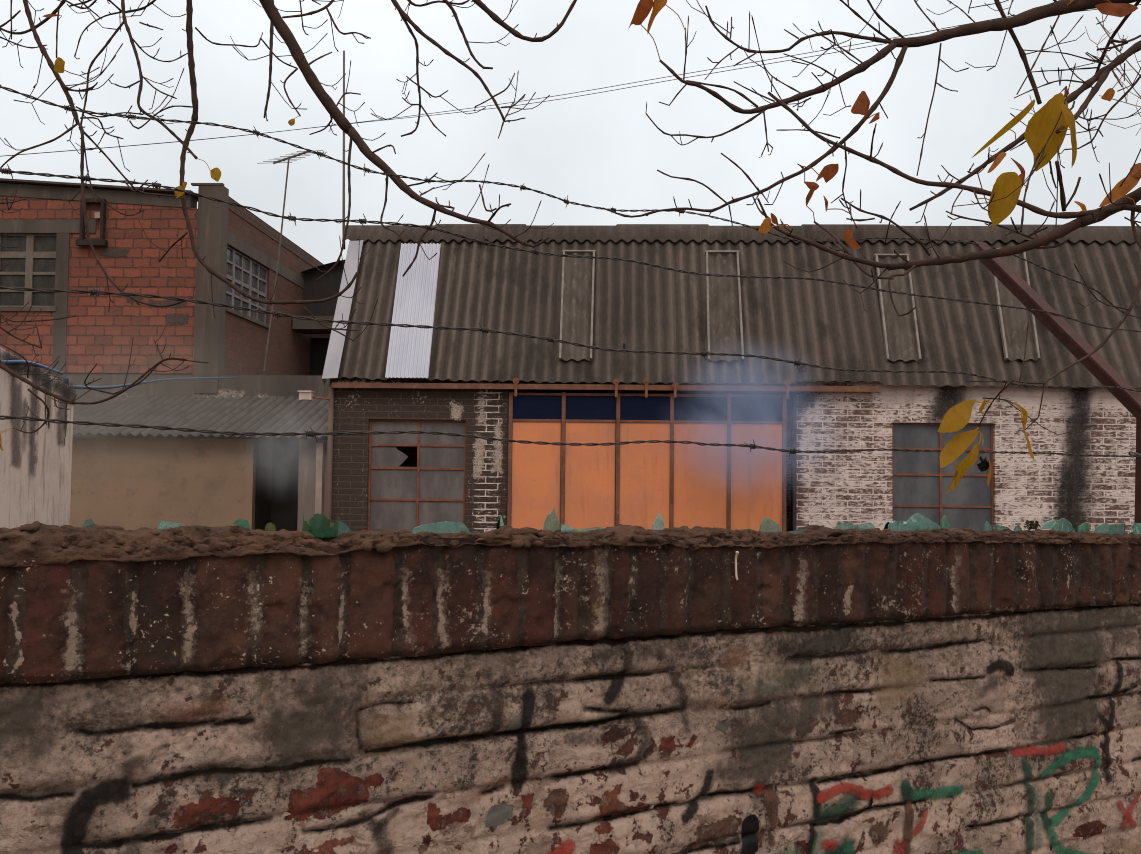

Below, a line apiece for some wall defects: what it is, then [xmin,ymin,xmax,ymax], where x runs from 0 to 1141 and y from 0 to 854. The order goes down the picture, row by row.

leakage [0,351,75,475]
leakage [1056,387,1092,532]
leakage [1019,607,1139,749]
peeling [172,794,242,829]
peeling [282,764,384,822]
peeling [517,788,569,819]
peeling [590,784,654,854]